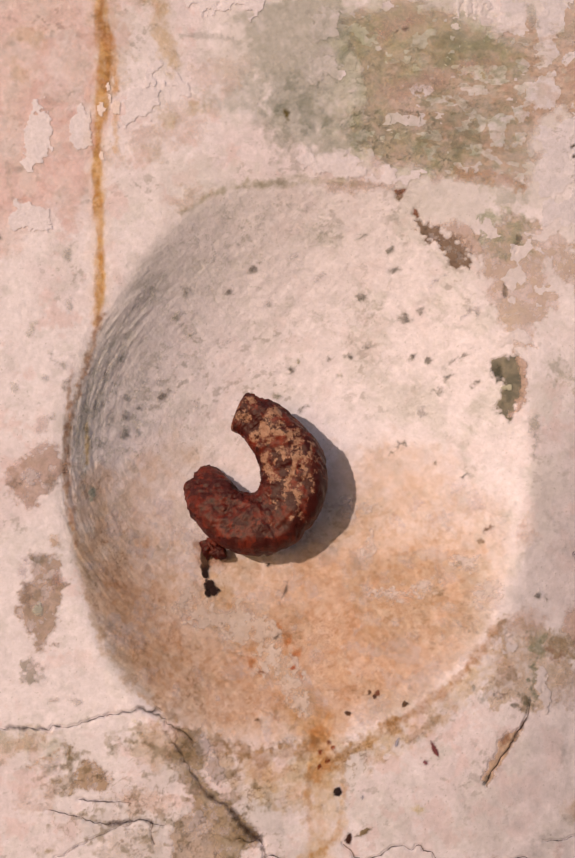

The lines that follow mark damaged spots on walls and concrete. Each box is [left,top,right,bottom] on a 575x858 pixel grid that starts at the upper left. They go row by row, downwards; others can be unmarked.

corrosion [97,82,120,116]
peeling [19,96,53,172]
peeling [69,103,93,150]
peeling [296,0,575,307]
peeling [8,198,52,233]
spalling [491,322,541,421]
corrosion [200,552,220,597]
crack [6,706,279,858]
crack [343,844,436,858]